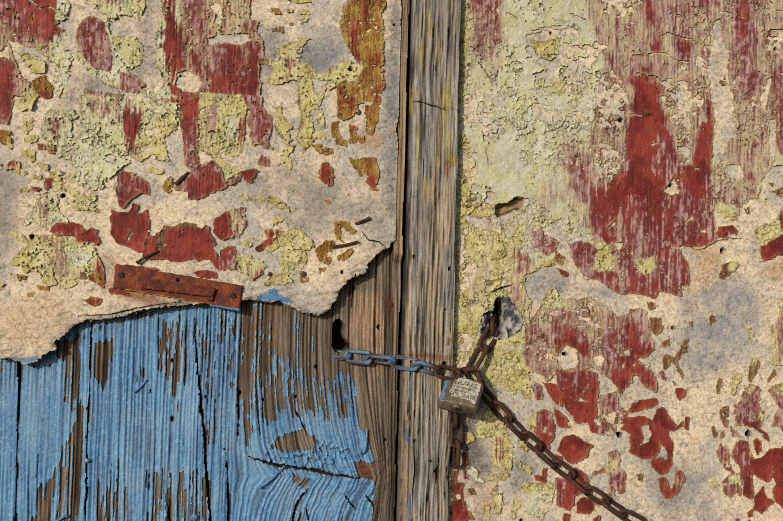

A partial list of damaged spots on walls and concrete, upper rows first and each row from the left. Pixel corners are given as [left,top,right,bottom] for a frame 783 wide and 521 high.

peeling [0,0,386,306]
crack [412,101,449,111]
peeling [448,0,783,521]
peeling [94,338,113,391]
peeling [158,314,187,409]
peeling [229,299,337,440]
peeling [31,331,84,521]
peeling [97,458,127,521]
peeling [145,468,207,521]
crack [194,318,240,521]
peeling [271,429,319,453]
crack [248,456,374,521]